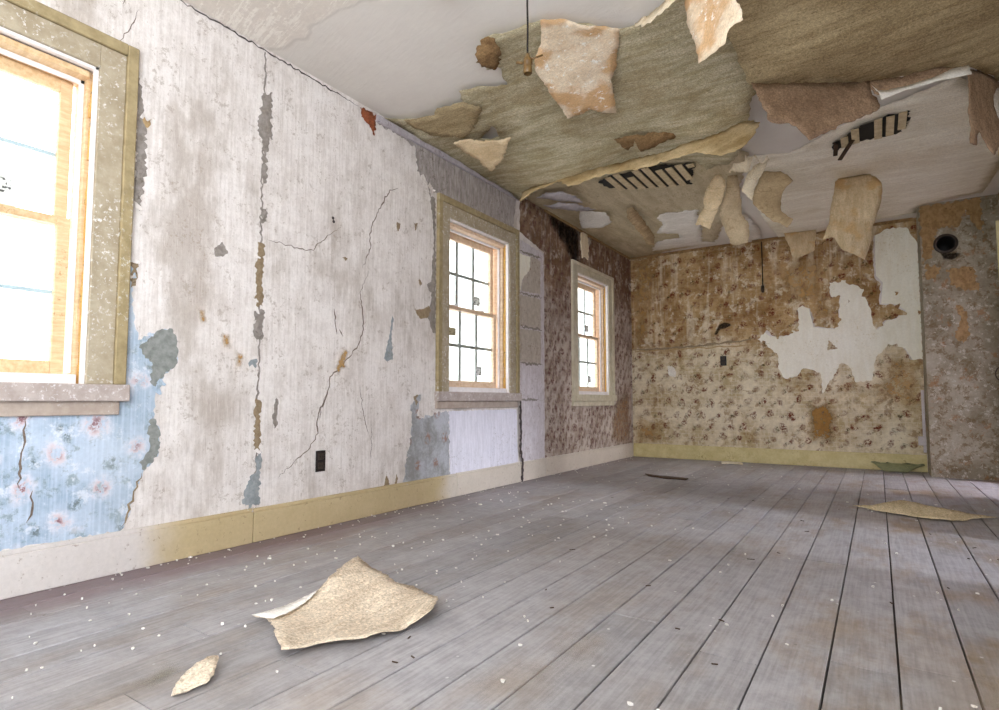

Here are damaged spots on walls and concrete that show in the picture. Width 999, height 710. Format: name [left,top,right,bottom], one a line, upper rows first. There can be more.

spalling [257,90,273,184]
crack [259,139,341,251]
flaking render [360,107,516,333]
flaking render [652,210,717,251]
crack [17,417,34,523]
crack [253,339,261,473]
spalling [253,242,265,341]
spalling [242,398,279,512]
crack [282,188,398,474]
crack [517,401,525,482]
flaking render [520,240,545,462]
peeling [758,227,923,393]